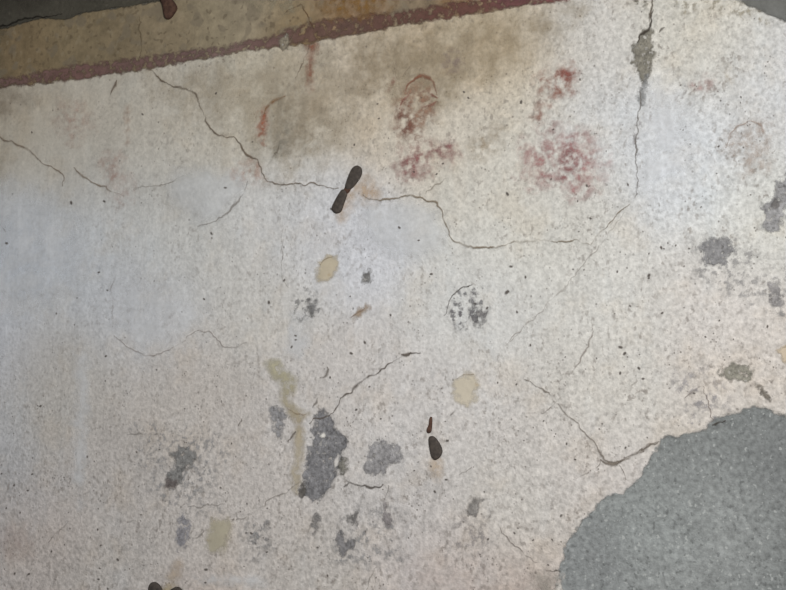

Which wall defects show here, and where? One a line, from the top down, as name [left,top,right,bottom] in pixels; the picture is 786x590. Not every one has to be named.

spalling [630,0,656,105]
crack [0,137,108,190]
crack [155,74,336,226]
crack [363,195,514,248]
spalling [299,409,348,502]
crack [288,352,421,441]
crack [524,379,660,472]